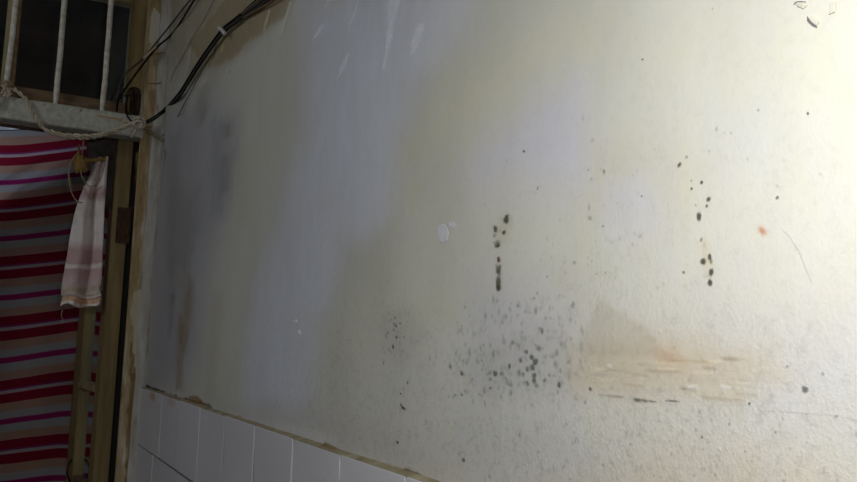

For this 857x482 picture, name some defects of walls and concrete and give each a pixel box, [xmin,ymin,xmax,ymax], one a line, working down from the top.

leakage [493,214,509,291]
leakage [489,346,546,389]